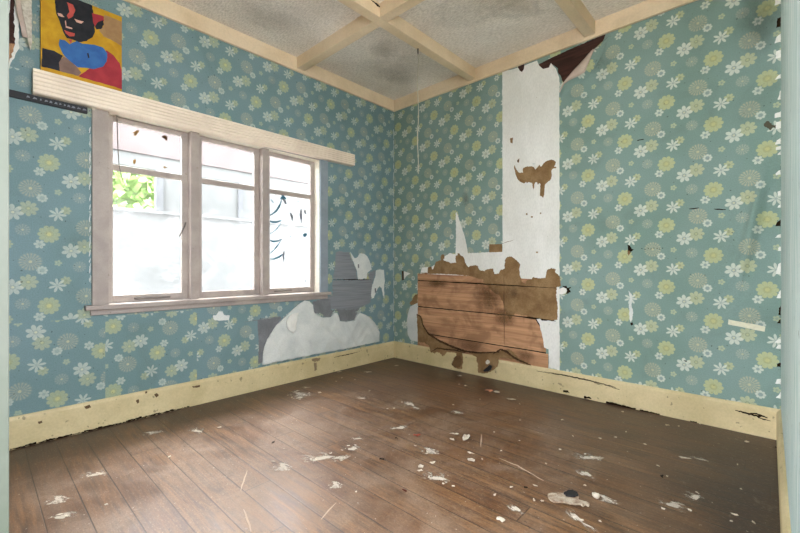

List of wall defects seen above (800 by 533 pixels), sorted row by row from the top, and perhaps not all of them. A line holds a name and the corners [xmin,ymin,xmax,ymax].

peeling [443,61,560,279]
peeling [312,251,385,321]
peeling [549,287,560,370]
crack [735,410,770,421]